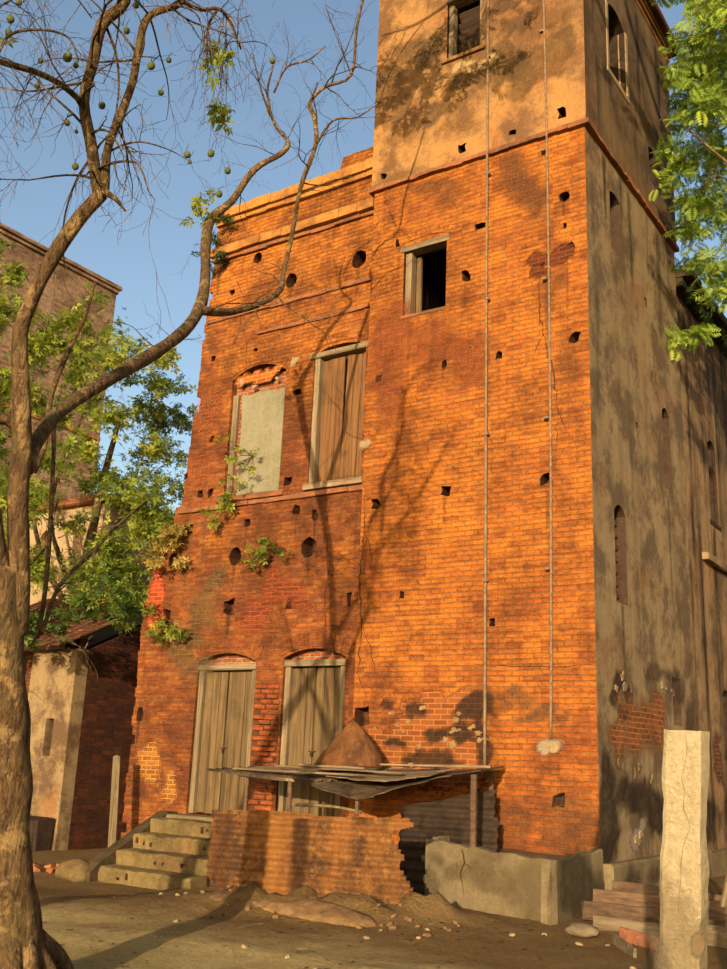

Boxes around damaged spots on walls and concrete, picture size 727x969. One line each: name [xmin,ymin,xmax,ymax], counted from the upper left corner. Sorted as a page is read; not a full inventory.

peeling [235,357,299,389]
crack [324,487,375,697]
spalling [367,687,490,797]
peeling [537,740,561,755]
spalling [609,671,675,785]
corrosion [265,816,282,894]
corrosion [291,818,308,891]